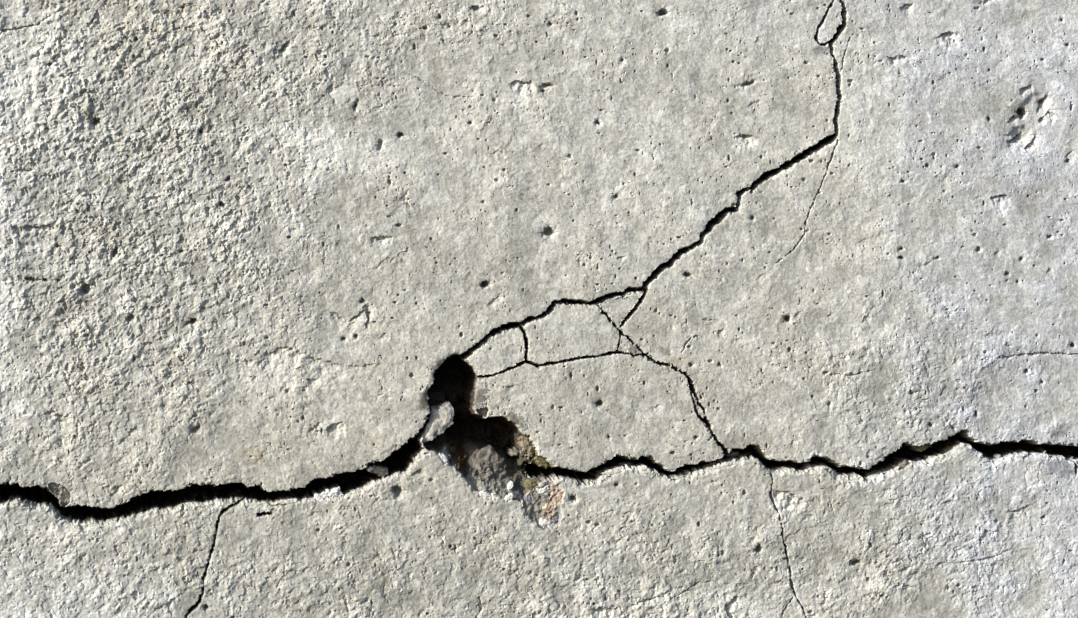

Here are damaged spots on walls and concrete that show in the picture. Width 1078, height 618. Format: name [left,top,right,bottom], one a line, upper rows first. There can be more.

crack [0,13,52,37]
crack [415,76,475,100]
crack [461,0,1078,618]
spalling [427,354,479,409]
crack [0,412,430,618]
corrosion [442,383,475,478]
spalling [419,407,565,533]